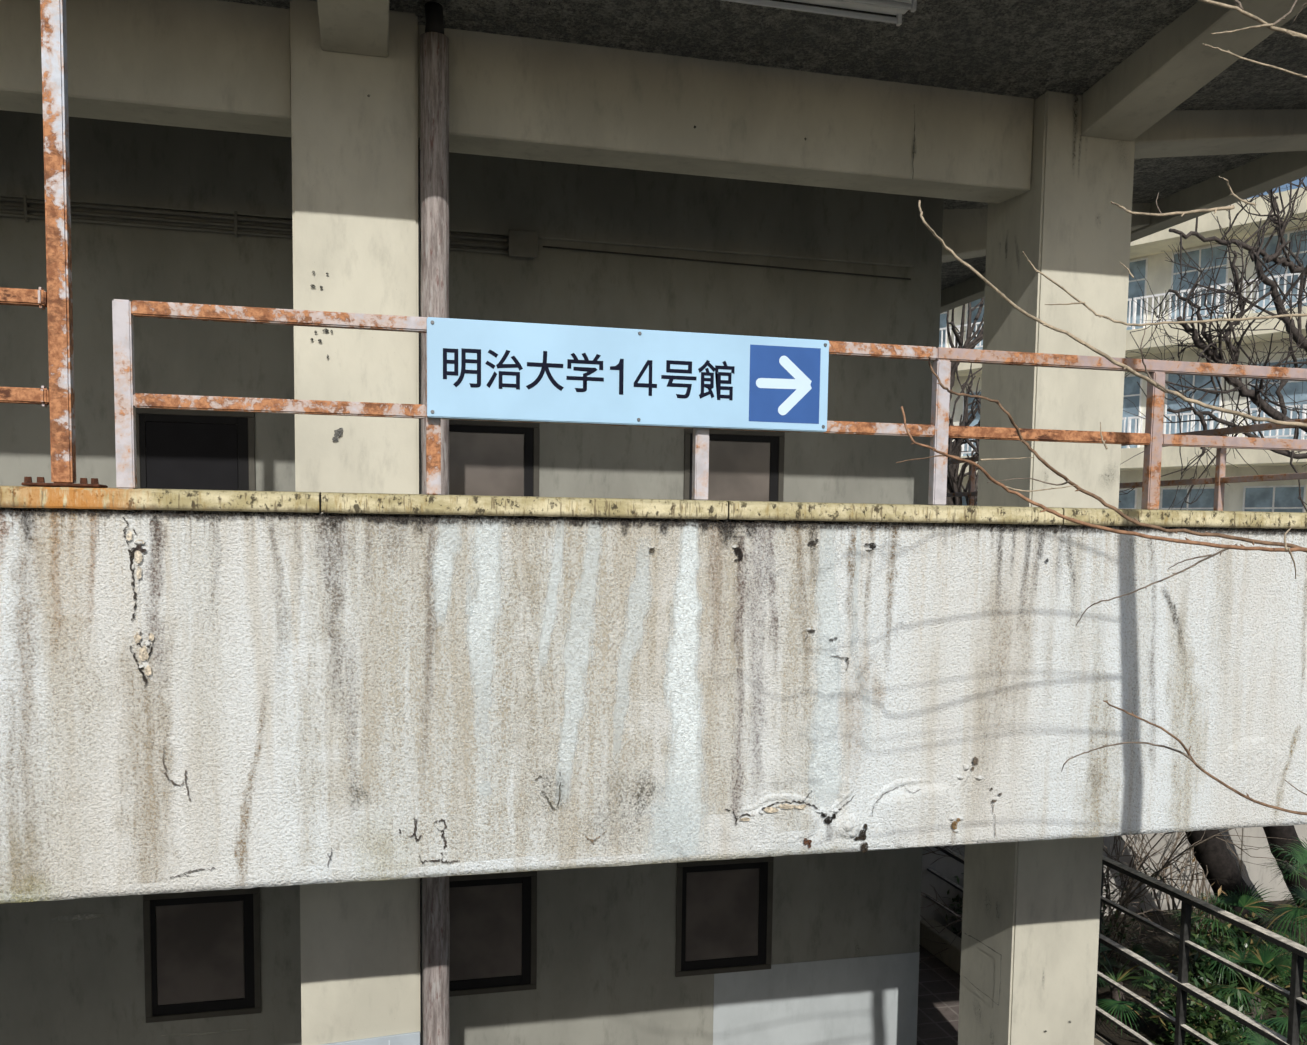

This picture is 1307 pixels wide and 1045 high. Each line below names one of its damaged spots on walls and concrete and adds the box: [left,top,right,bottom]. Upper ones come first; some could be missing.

spalling [126,531,147,579]
spalling [134,632,154,676]
leakage [0,508,1307,885]
crack [724,770,970,826]